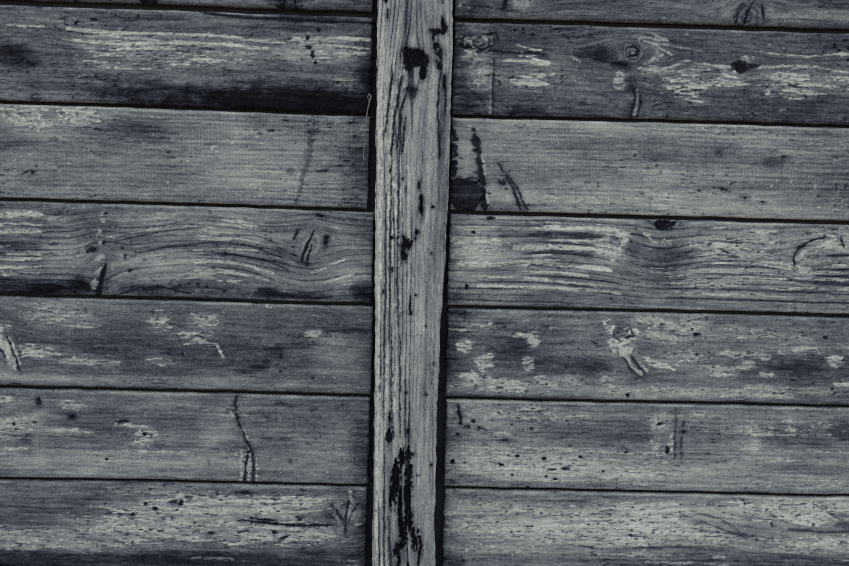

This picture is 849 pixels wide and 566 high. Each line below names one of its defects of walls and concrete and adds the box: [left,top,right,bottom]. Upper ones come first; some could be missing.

crack [435,69,448,159]
crack [457,31,547,116]
crack [496,162,530,212]
crack [292,228,316,267]
crack [323,67,411,446]
peeling [601,313,849,400]
crack [231,394,257,482]
peeling [445,321,707,488]
peeling [714,418,849,464]
crack [236,489,359,535]
crack [377,454,393,566]
peeling [445,474,849,566]